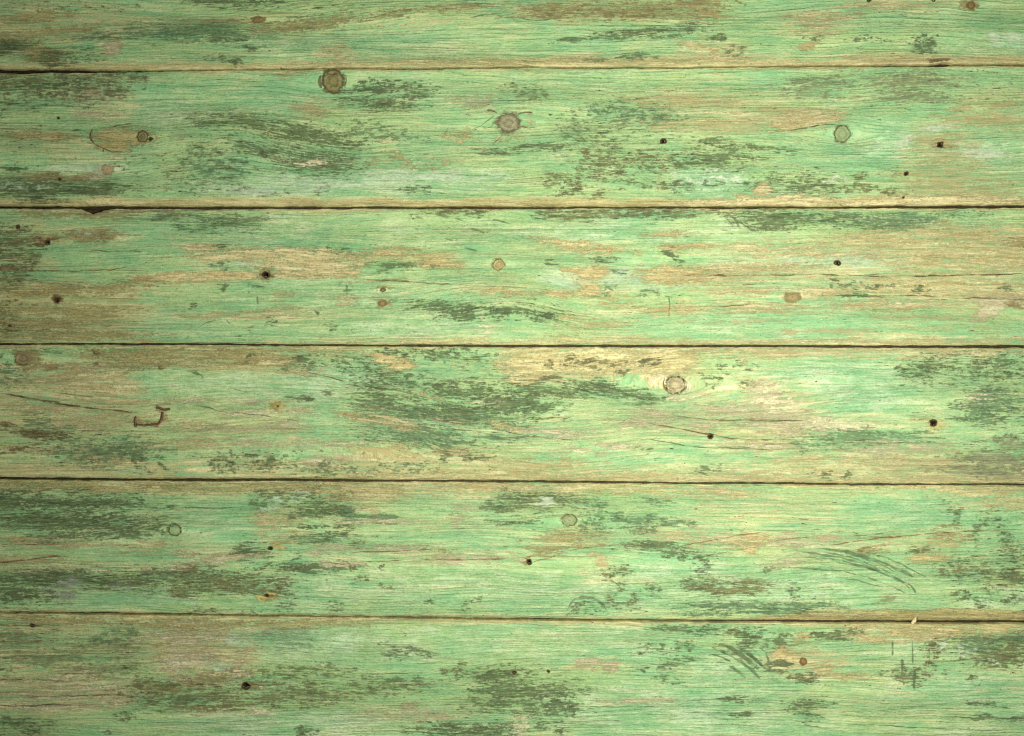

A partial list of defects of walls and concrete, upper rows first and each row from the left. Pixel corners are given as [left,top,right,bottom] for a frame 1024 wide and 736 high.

peeling [442,82,549,156]
peeling [657,158,1024,206]
peeling [0,220,1024,615]
peeling [0,600,383,736]
peeling [378,643,436,661]
peeling [637,640,698,685]
peeling [734,568,1024,722]
peeling [534,691,576,736]
peeling [718,695,759,718]